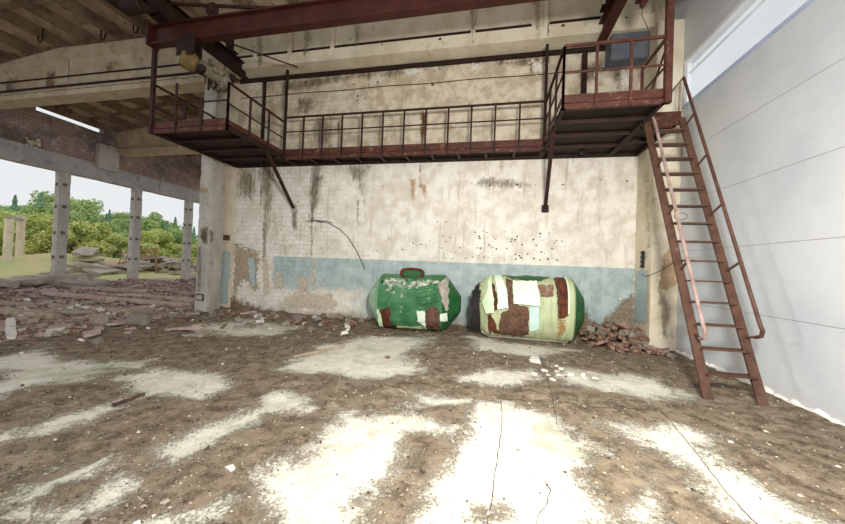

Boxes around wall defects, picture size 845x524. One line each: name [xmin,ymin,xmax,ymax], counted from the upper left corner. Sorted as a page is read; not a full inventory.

leakage [237,167,272,211]
leakage [311,166,321,222]
peeling [220,243,337,312]
peeling [600,249,676,339]
crack [487,399,522,524]